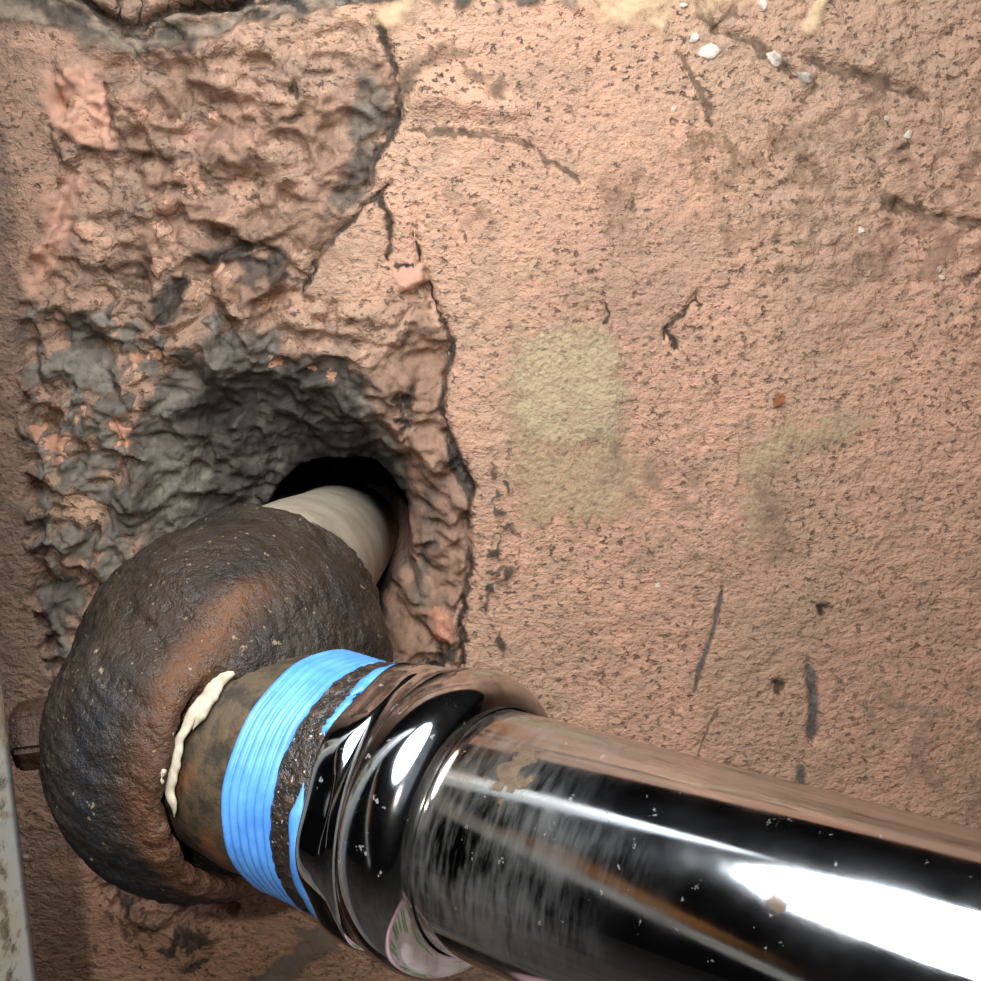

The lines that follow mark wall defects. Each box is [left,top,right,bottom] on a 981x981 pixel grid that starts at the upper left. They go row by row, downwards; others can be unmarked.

crack [76,0,275,41]
flaking render [0,0,415,77]
crack [59,81,136,157]
flaking render [11,66,514,668]
crack [302,20,580,668]